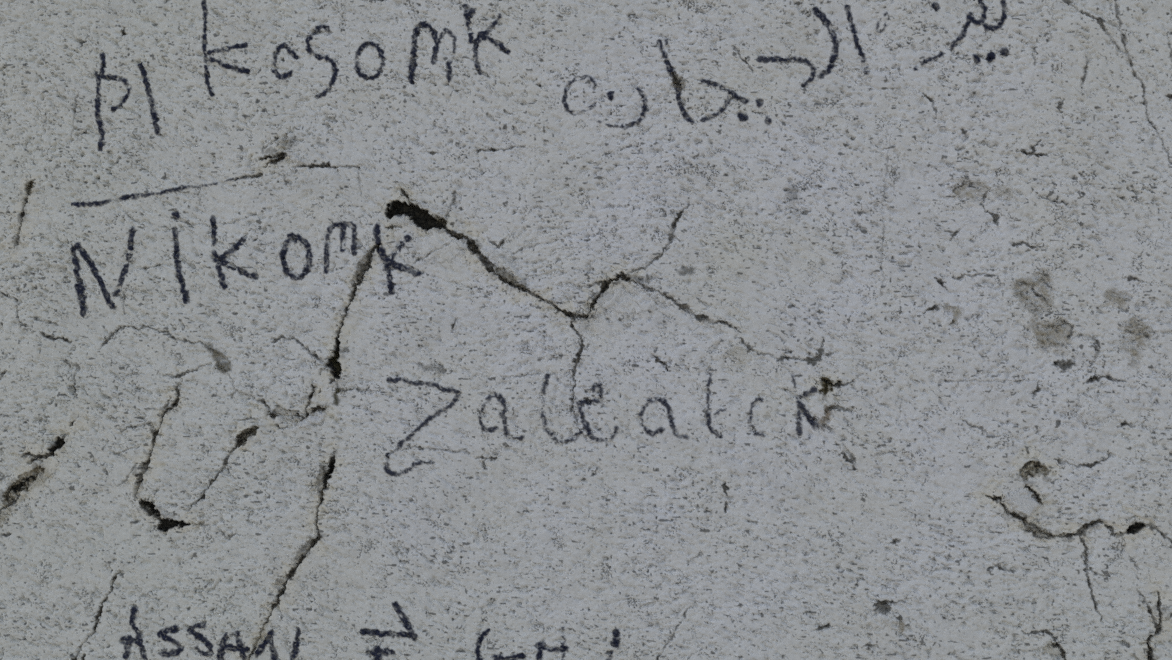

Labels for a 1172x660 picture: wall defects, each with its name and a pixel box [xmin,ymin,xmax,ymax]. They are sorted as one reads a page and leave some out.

crack [1064,1,1172,98]
crack [275,191,731,402]
crack [757,348,831,366]
crack [198,418,258,501]
crack [252,448,335,654]
crack [990,495,1172,609]
crack [1127,596,1172,660]